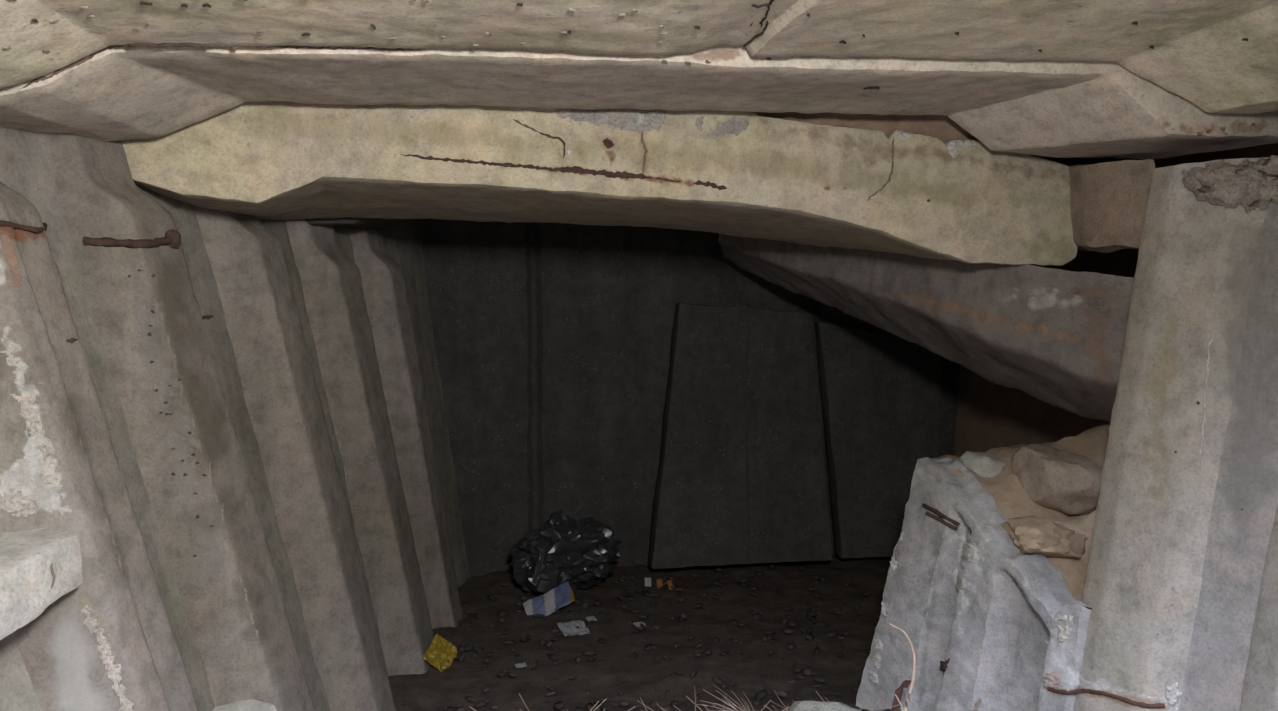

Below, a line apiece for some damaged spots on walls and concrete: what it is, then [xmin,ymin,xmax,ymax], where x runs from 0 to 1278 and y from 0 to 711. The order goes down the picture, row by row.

crack [743,0,774,47]
crack [20,43,413,89]
spalling [1182,155,1278,214]
rust [0,220,48,276]
rust [83,229,181,248]
rust [922,503,960,531]
rust [1047,687,1165,708]